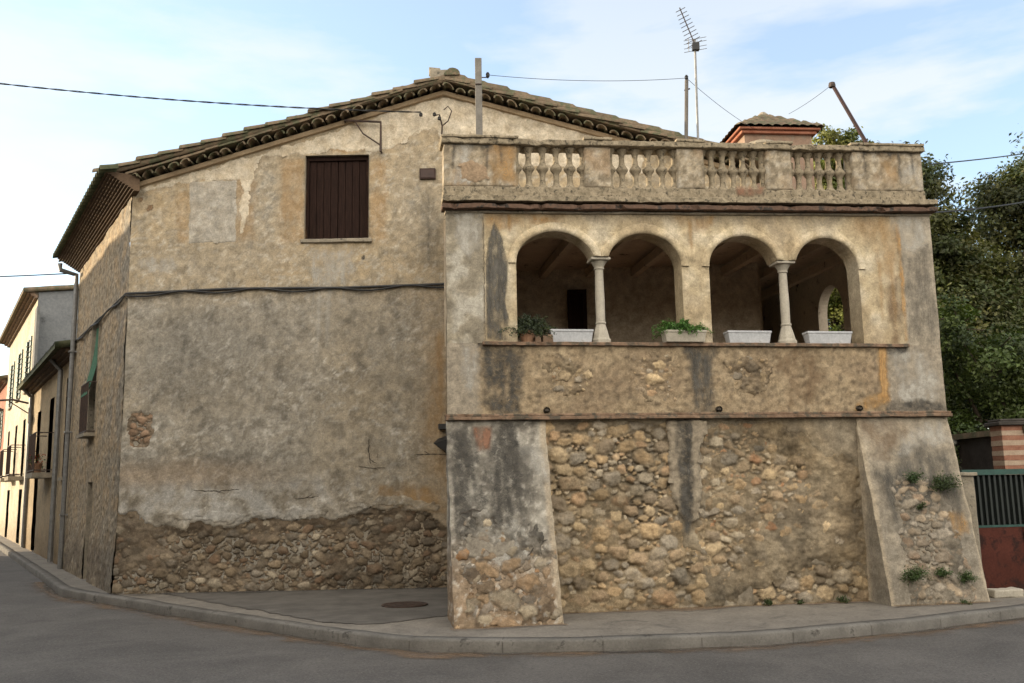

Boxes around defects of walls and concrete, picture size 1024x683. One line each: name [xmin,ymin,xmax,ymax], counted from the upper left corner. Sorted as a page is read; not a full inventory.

peeling [140,98,596,234]
peeling [612,154,644,174]
spalling [127,411,154,447]
spalling [112,420,869,629]
leakage [450,213,547,541]
leakage [677,420,693,534]